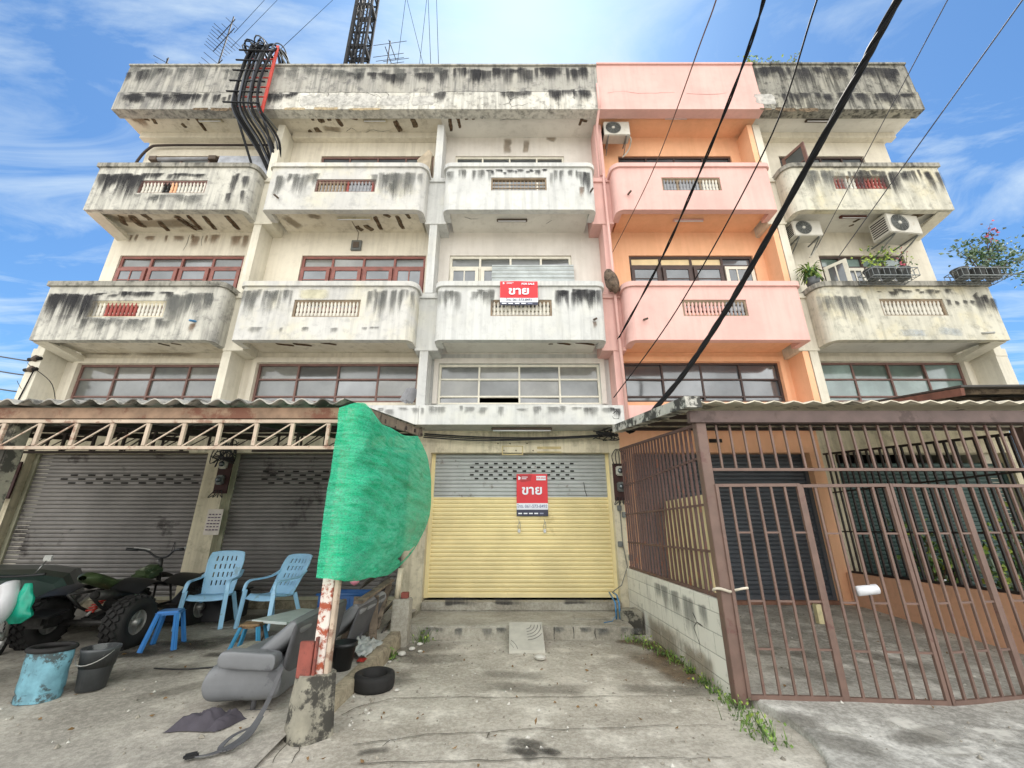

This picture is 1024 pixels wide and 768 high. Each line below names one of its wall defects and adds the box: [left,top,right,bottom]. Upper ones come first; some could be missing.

leakage [127,68,165,79]
leakage [755,66,847,79]
leakage [864,67,898,80]
leakage [123,92,238,102]
leakage [268,92,297,100]
leakage [782,93,912,102]
leakage [98,173,204,193]
leakage [226,173,249,200]
leakage [854,170,943,189]
leakage [46,291,173,317]
leakage [556,289,601,304]
leakage [973,293,997,308]